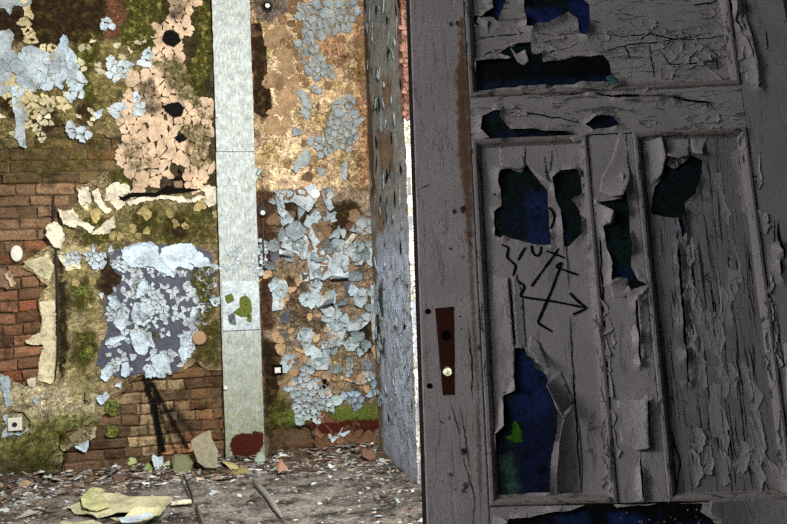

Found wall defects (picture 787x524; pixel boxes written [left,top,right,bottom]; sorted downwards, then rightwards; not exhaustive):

crack [477,32,550,57]
crack [598,33,724,90]
rust [456,18,471,246]
crack [487,90,628,163]
flaking render [0,0,415,475]
leakage [148,377,194,456]